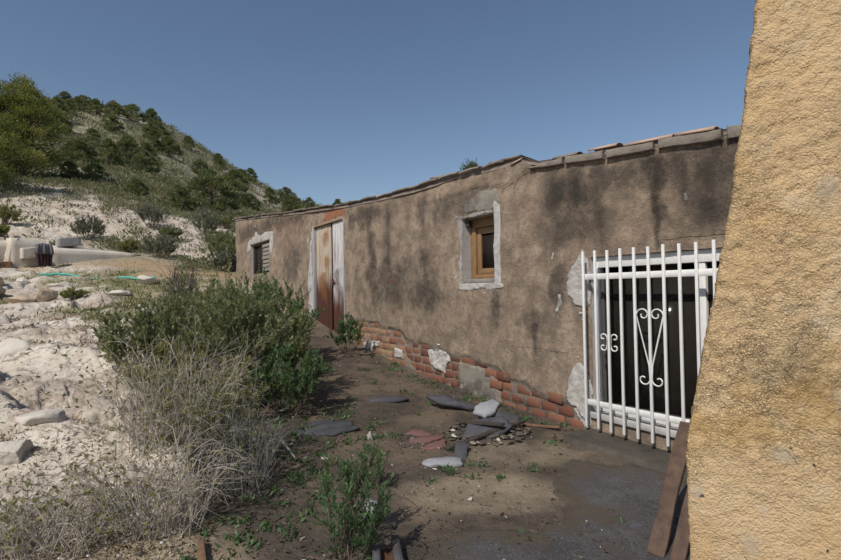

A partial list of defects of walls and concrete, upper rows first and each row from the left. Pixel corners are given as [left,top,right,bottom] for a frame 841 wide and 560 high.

peeling [555,250,592,321]
flaking render [346,317,594,430]